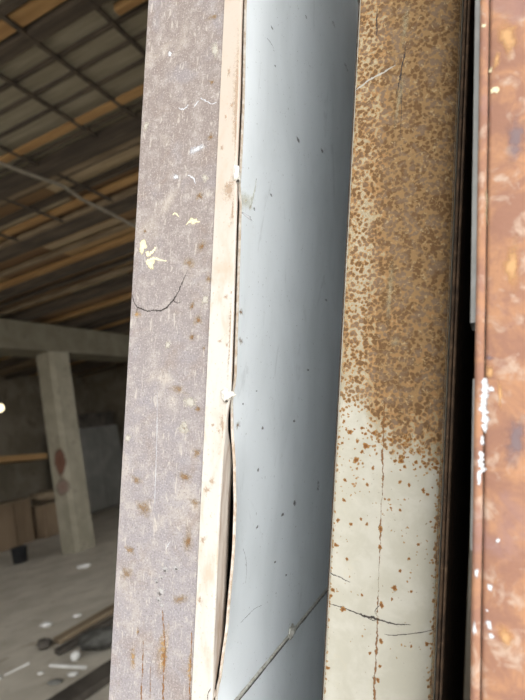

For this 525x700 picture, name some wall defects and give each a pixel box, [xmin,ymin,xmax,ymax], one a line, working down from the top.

rust [500,27,515,51]
crack [396,47,406,135]
crack [132,270,188,312]
rust [334,0,462,700]
rust [328,510,348,628]
rust [159,610,167,700]
crack [329,603,435,636]